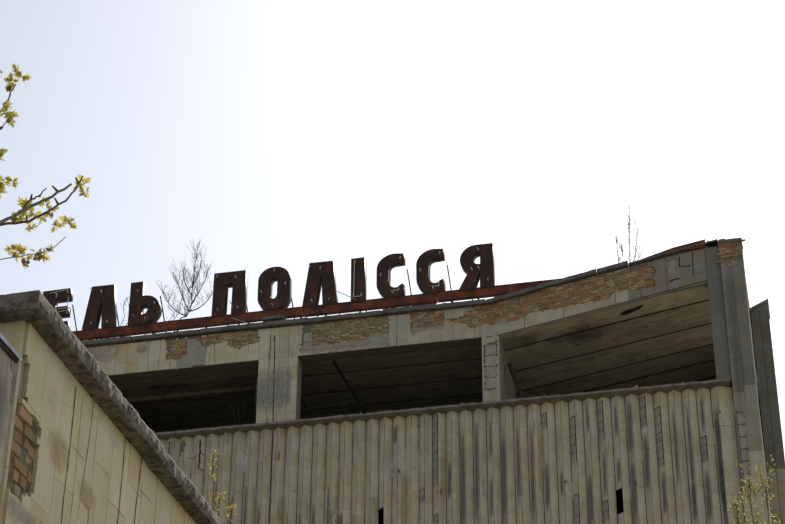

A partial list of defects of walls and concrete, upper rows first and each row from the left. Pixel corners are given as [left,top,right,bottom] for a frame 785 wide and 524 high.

spalling [716,238,745,267]
spalling [166,330,260,369]
spalling [300,315,390,354]
spalling [409,264,656,334]
spalling [7,355,38,499]
damp [490,442,507,518]
damp [530,441,549,513]
damp [687,419,697,521]
damp [715,420,728,524]